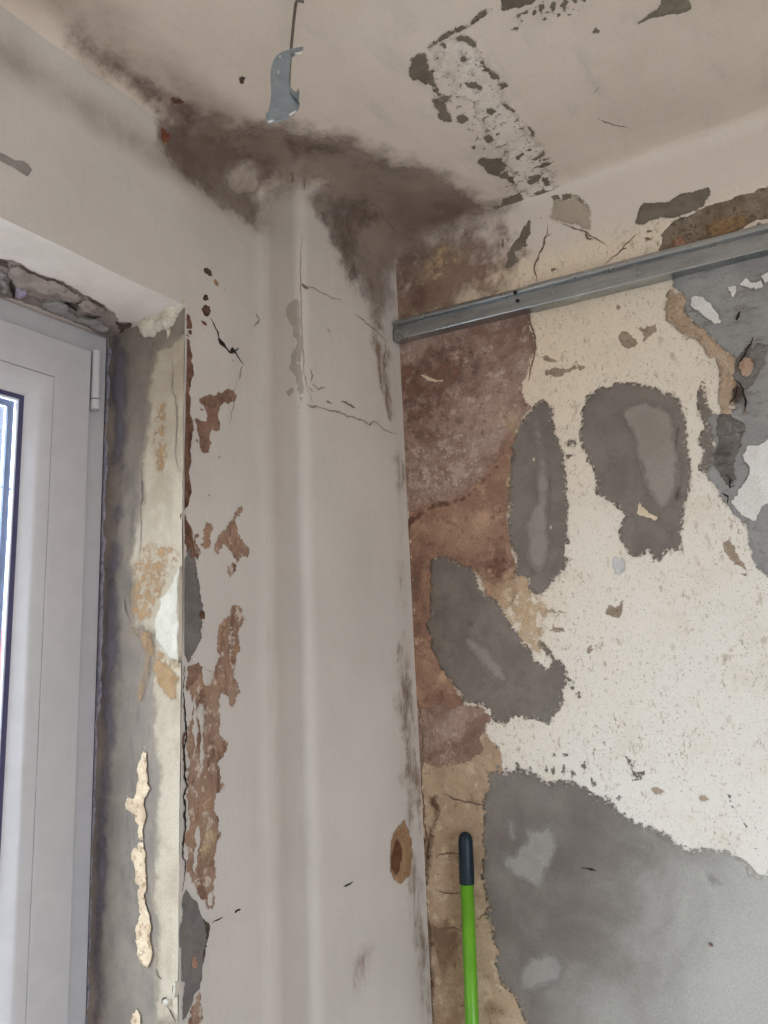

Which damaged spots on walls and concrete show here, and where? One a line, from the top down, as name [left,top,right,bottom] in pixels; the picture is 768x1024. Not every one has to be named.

crack [210,318,244,419]
damp [84,43,525,320]
crack [299,236,392,433]
peeling [399,314,585,512]
peeling [409,0,586,209]
crack [528,313,537,381]
crack [533,224,636,281]
flaking render [618,289,747,414]
flaking render [645,187,768,251]
peeling [0,259,250,1024]
spalling [723,538,747,576]
flaking render [419,733,532,1024]